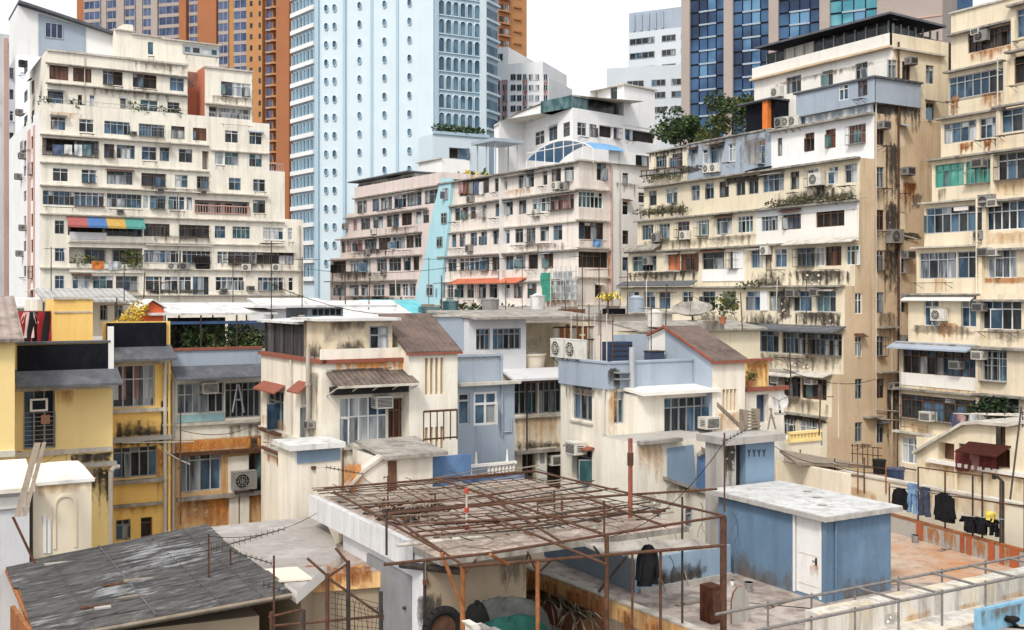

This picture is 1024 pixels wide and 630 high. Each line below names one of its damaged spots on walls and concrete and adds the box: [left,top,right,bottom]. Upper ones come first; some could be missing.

water stain [878,104,920,121]
water stain [884,142,921,292]
water stain [71,398,168,501]
corrosion [175,436,278,466]
corrosion [344,463,361,493]
corrosion [178,498,229,523]
corrosion [329,564,371,584]